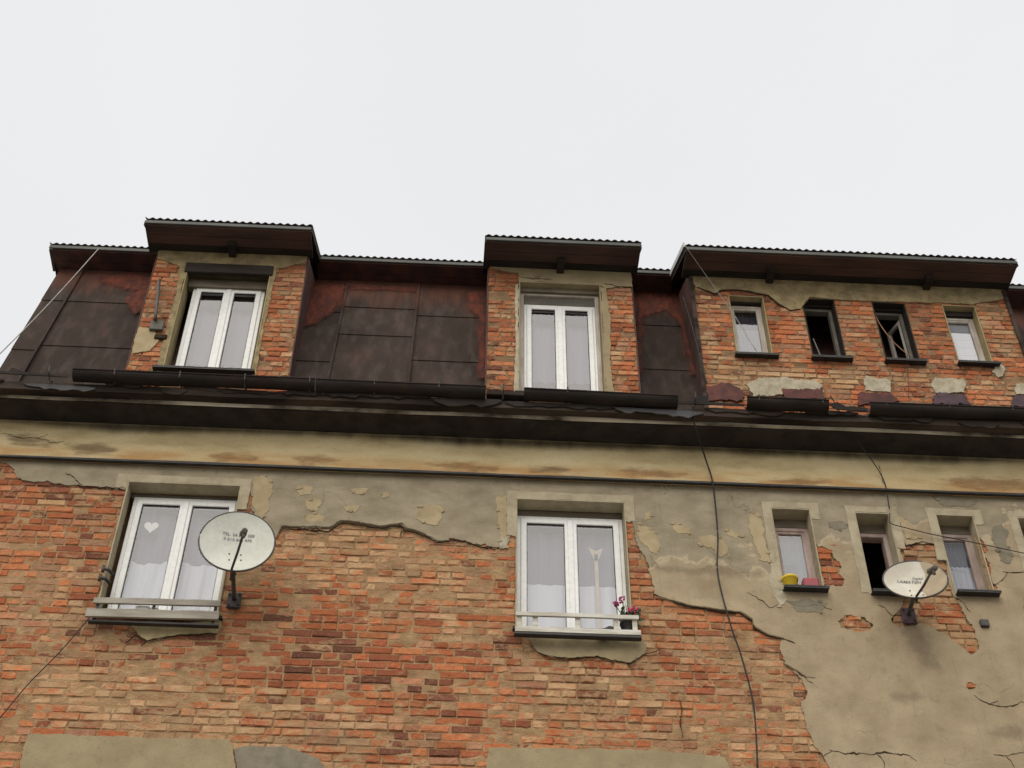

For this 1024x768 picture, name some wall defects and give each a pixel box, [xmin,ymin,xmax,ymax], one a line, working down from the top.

rust [100,274,151,313]
rust [304,283,417,326]
rust [637,288,696,374]
spalling [813,540,844,586]
spalling [0,462,829,768]
spalling [839,615,871,632]
spalling [892,544,979,654]
crack [822,750,917,768]